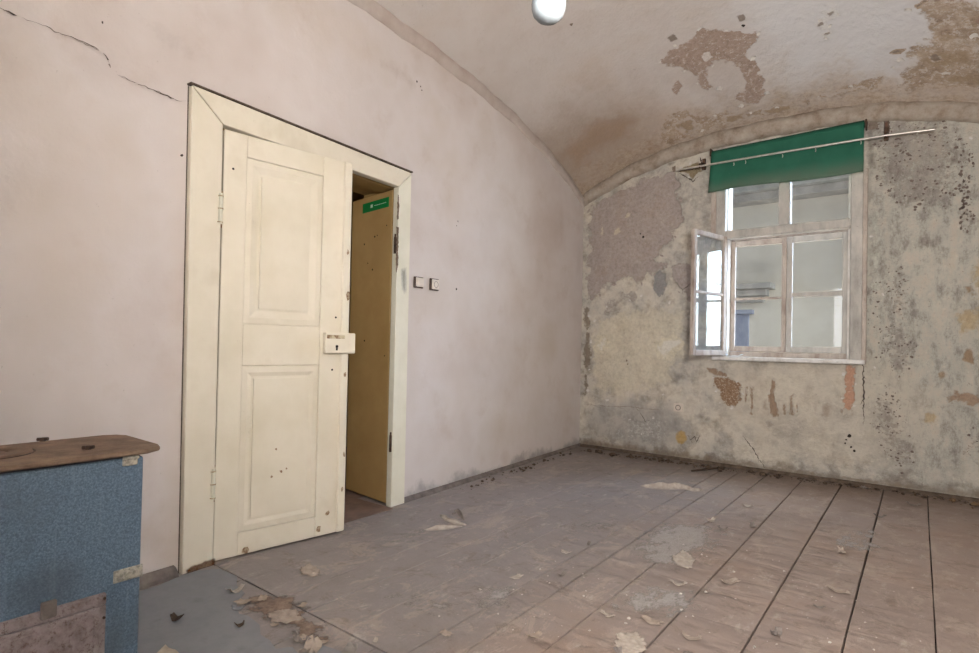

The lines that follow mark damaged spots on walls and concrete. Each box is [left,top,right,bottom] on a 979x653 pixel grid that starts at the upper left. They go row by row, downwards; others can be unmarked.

crack [1,8,178,101]
flaking render [653,0,979,146]
damp [864,120,979,233]
peeling [580,158,704,406]
spalling [705,366,800,431]
damp [581,241,979,498]